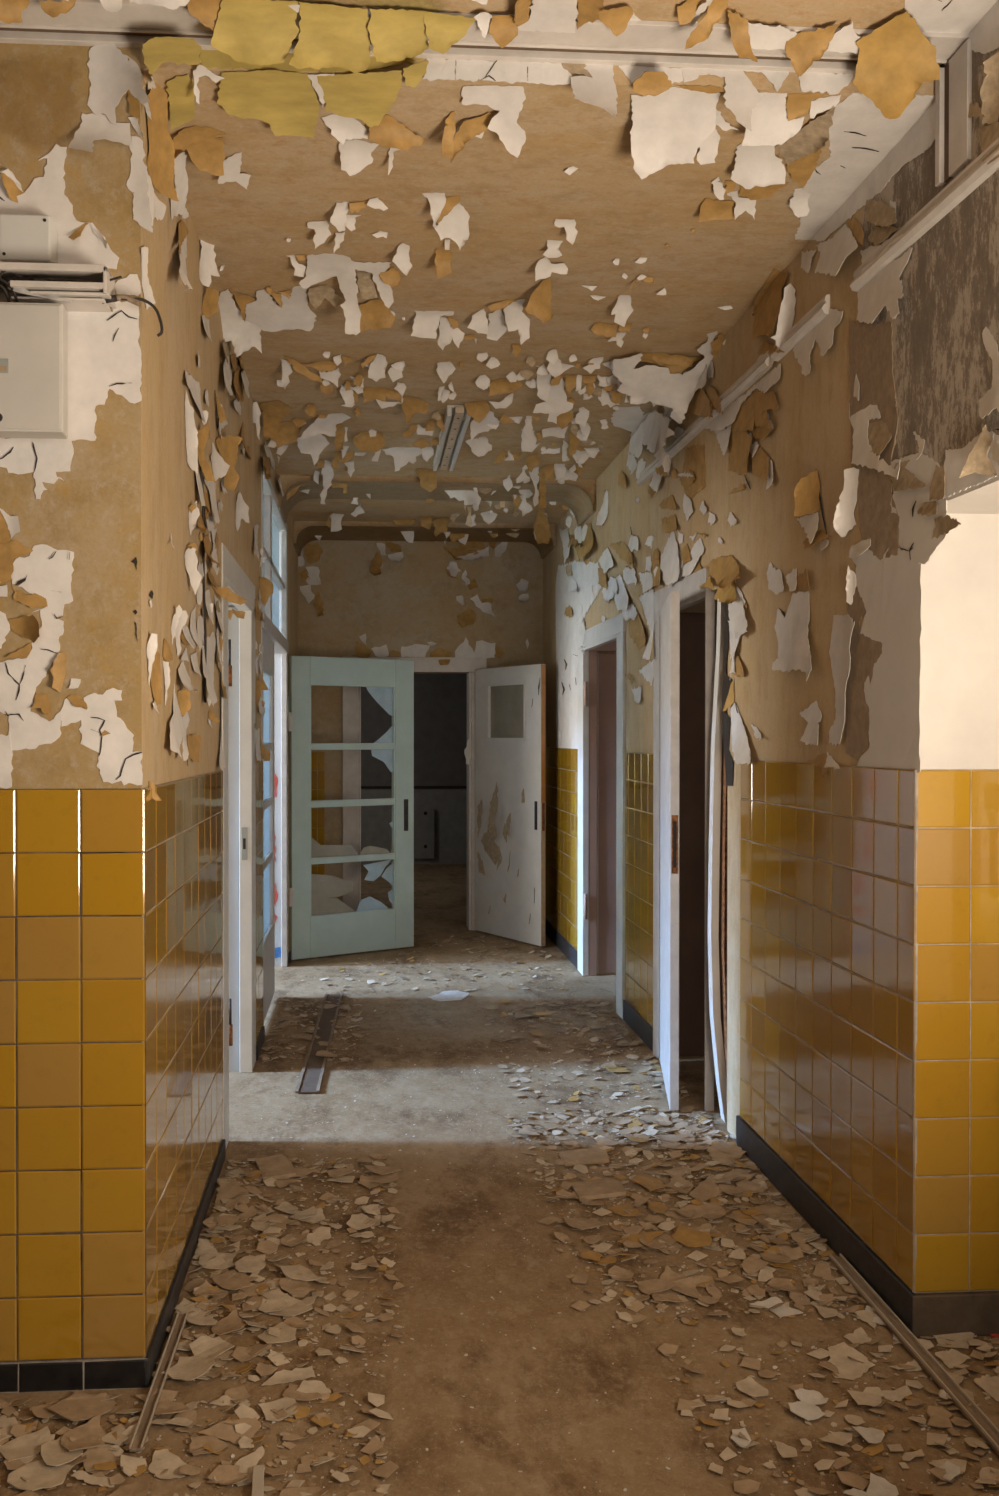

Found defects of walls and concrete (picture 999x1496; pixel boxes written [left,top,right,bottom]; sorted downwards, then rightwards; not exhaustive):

peeling [477,782,525,877]